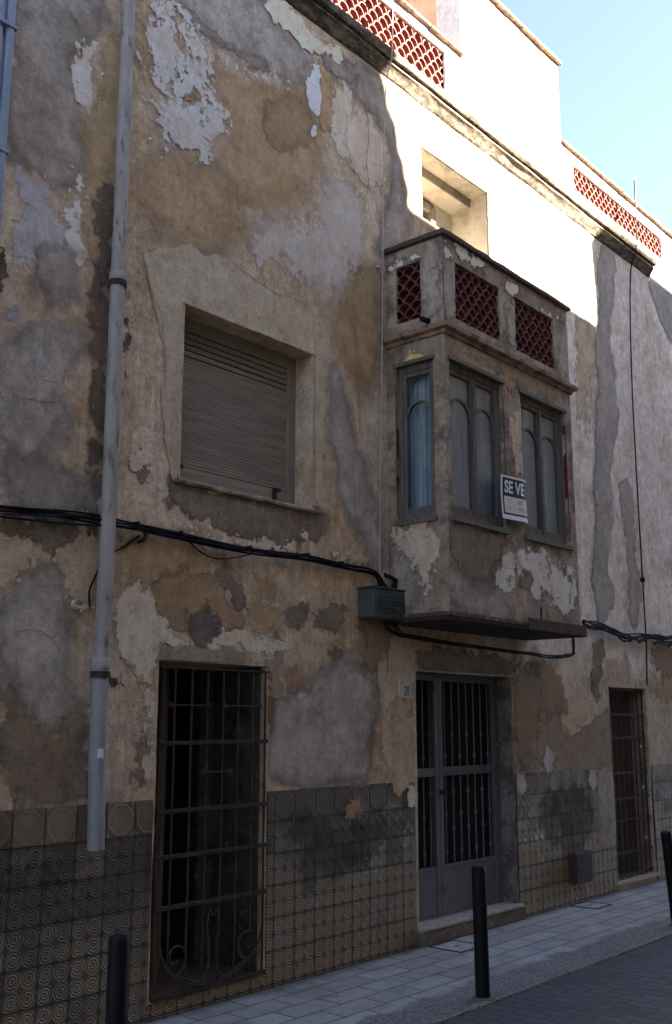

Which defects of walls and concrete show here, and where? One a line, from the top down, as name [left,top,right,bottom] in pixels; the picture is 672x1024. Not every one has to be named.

peeling [70,37,104,117]
peeling [134,0,240,165]
peeling [264,0,388,193]
leakage [142,53,359,256]
peeling [61,165,89,267]
leakage [0,34,121,558]
leakage [163,474,330,553]
peeling [390,522,441,596]
peeling [495,546,577,616]
peeling [112,568,295,781]
flaking render [516,774,528,797]